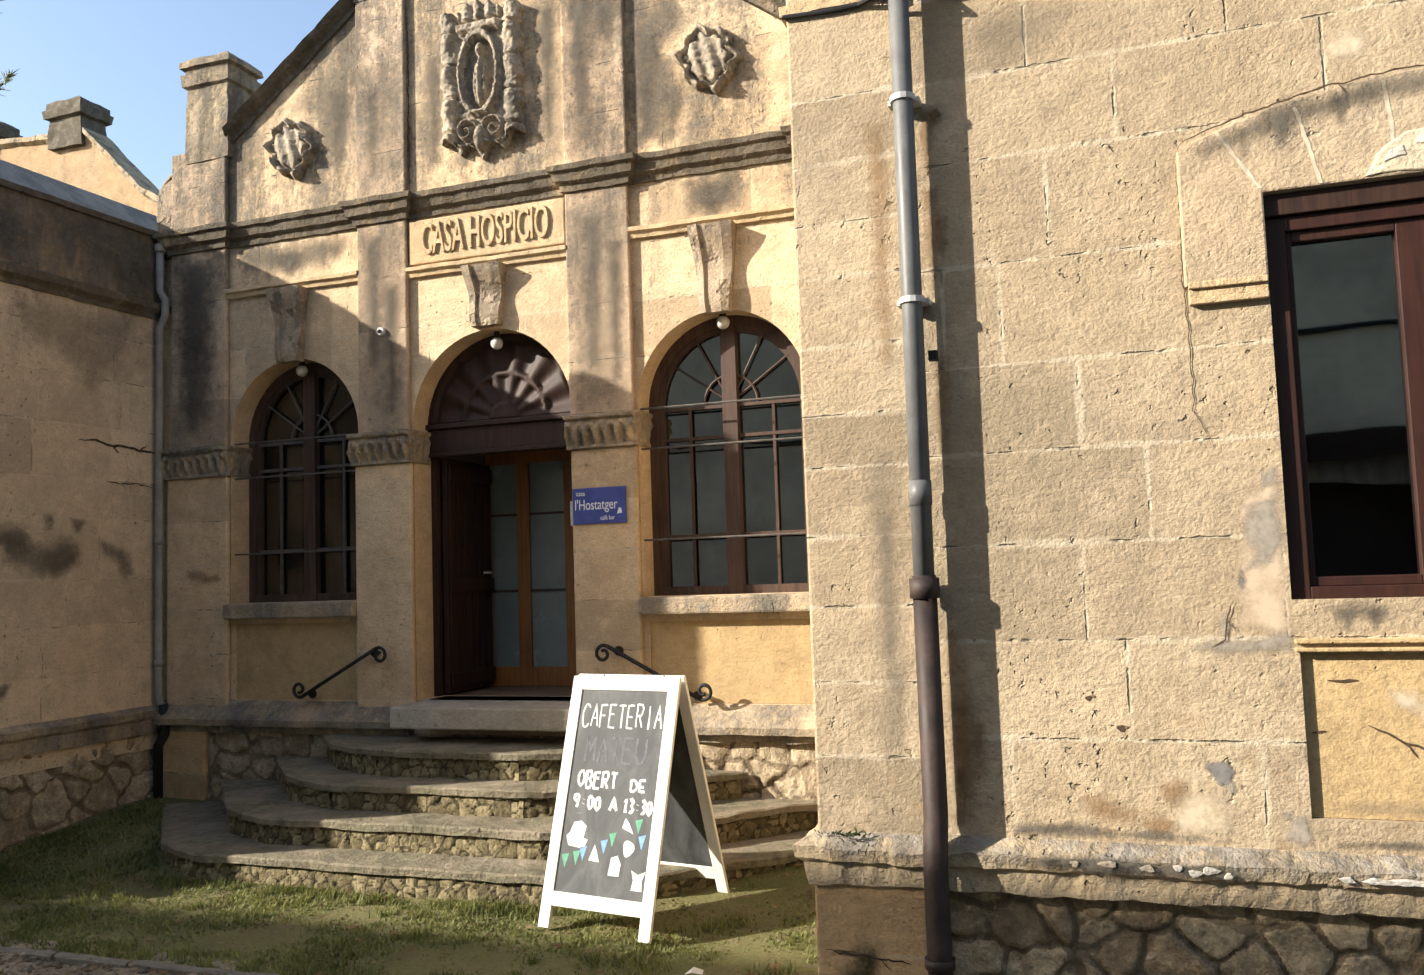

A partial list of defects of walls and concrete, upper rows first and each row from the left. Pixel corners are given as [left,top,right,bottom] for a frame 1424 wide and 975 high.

water stain [569,0,610,147]
crack [1174,64,1424,444]
water stain [179,260,214,432]
crack [79,439,155,488]
flaking render [1221,468,1289,636]
crack [1368,725,1424,759]
spalling [1338,877,1424,887]